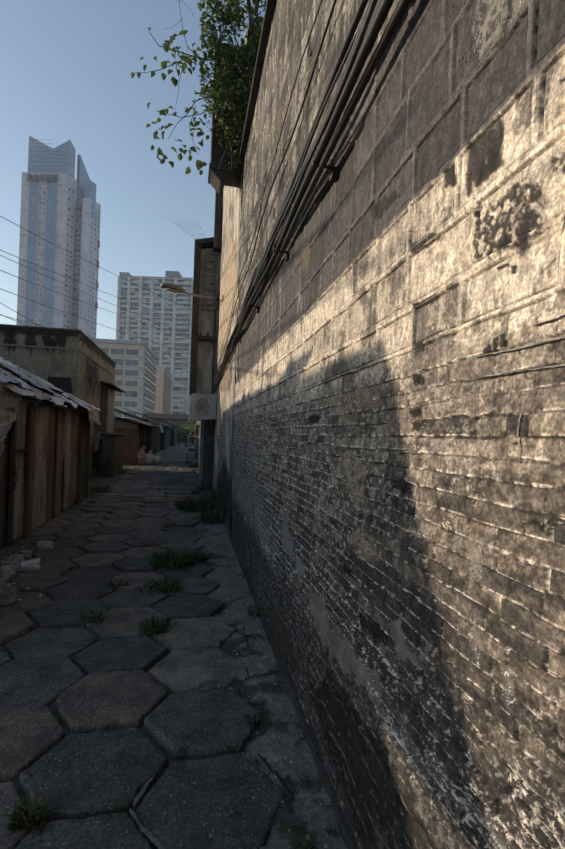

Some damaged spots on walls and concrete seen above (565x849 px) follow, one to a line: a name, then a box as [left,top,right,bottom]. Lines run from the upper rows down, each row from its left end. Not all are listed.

peeling [459,0,525,67]
leakage [501,668,517,706]
crack [129,763,165,849]
crack [258,753,291,795]
leakage [276,775,316,849]
leakage [310,667,508,849]
leakage [513,773,530,798]
leakage [548,788,565,818]